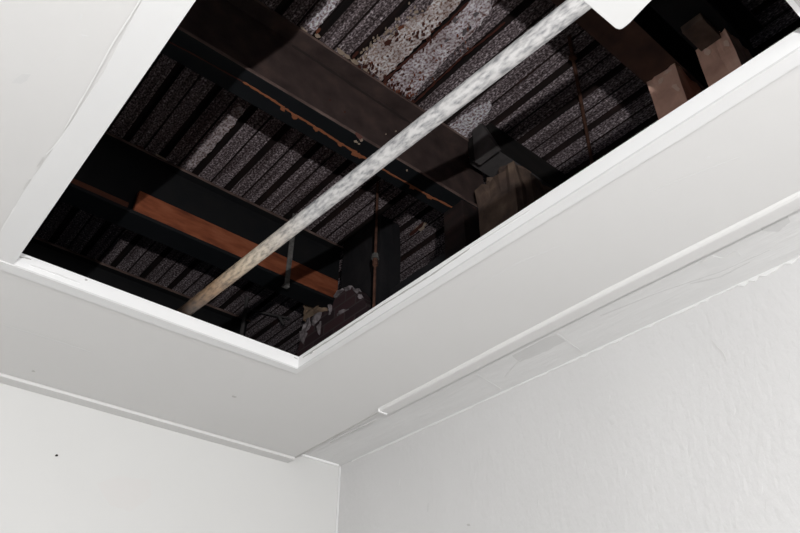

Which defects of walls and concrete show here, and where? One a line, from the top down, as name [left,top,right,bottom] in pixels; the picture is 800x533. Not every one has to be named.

peeling [337,0,492,97]
corrosion [352,2,505,103]
corrosion [381,168,452,208]
peeling [352,256,800,462]